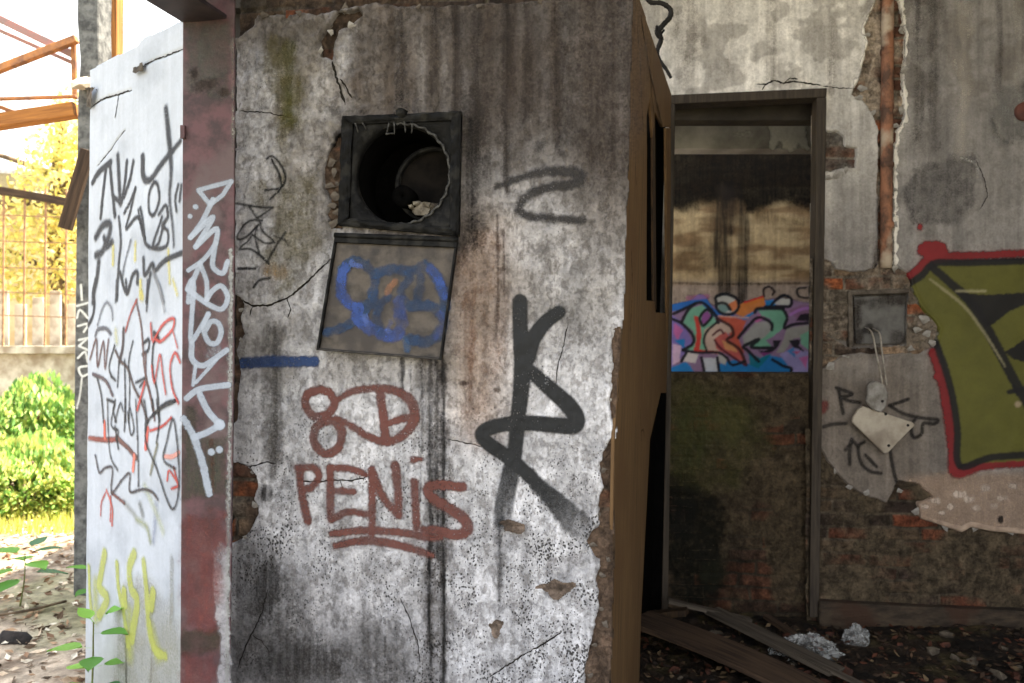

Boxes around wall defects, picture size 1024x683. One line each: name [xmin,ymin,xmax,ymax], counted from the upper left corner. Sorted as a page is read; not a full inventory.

crack [143,49,183,68]
crack [332,61,352,103]
spalling [231,0,542,61]
crack [758,78,852,90]
crack [243,260,329,317]
water stain [678,184,784,303]
spalling [809,0,937,371]
peeling [212,248,259,683]
water stain [419,360,451,683]
spalling [584,440,614,683]
flaking render [805,428,1024,621]
crack [490,632,562,677]